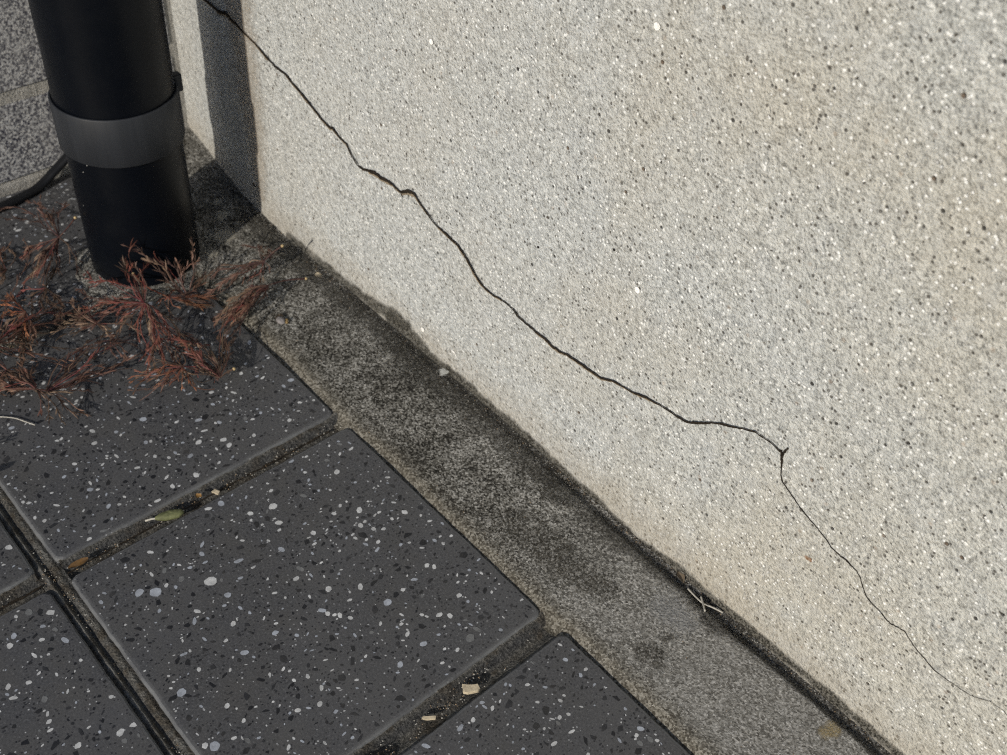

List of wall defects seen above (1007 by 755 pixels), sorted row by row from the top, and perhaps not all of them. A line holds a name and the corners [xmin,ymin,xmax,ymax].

crack [203,0,1006,714]